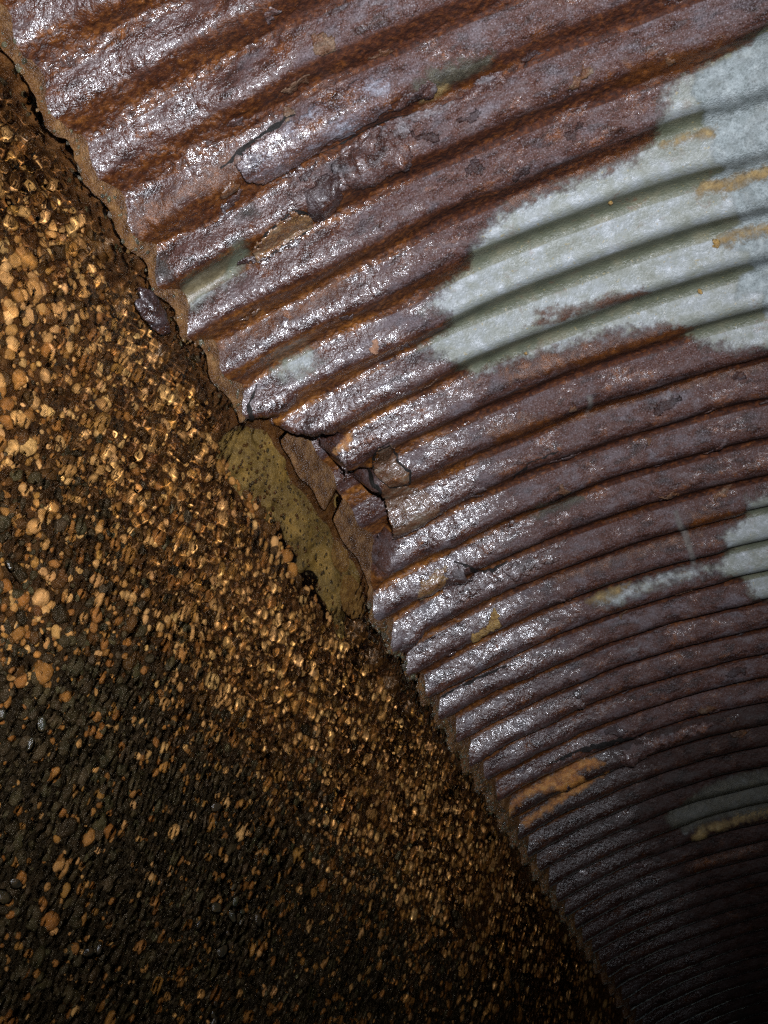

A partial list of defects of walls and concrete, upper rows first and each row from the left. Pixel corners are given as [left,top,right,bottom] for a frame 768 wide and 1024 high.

crack [220,114,295,169]
crack [367,442,390,495]
rust [0,0,768,801]
rust [509,702,768,1024]